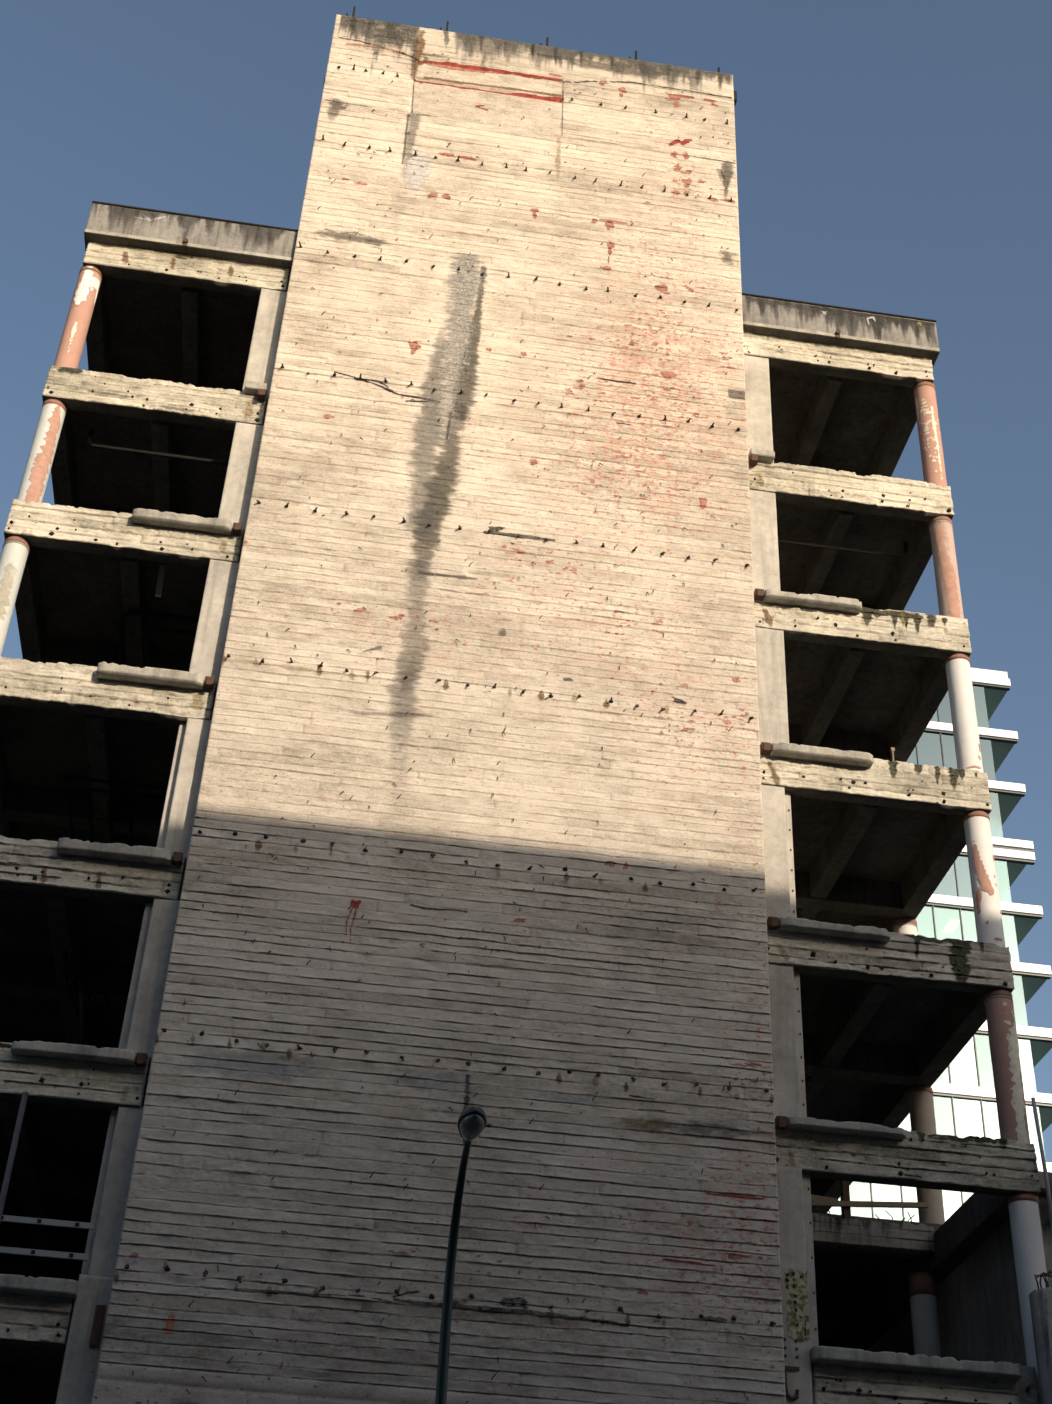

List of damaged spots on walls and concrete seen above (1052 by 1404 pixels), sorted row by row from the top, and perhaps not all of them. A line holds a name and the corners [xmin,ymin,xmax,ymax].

damp [340,15,419,61]
damp [746,295,935,339]
peeling [23,405,61,503]
damp [413,253,486,565]
peeling [935,523,961,618]
damp [914,764,977,788]
peeling [972,844,1002,941]
damp [906,934,984,957]